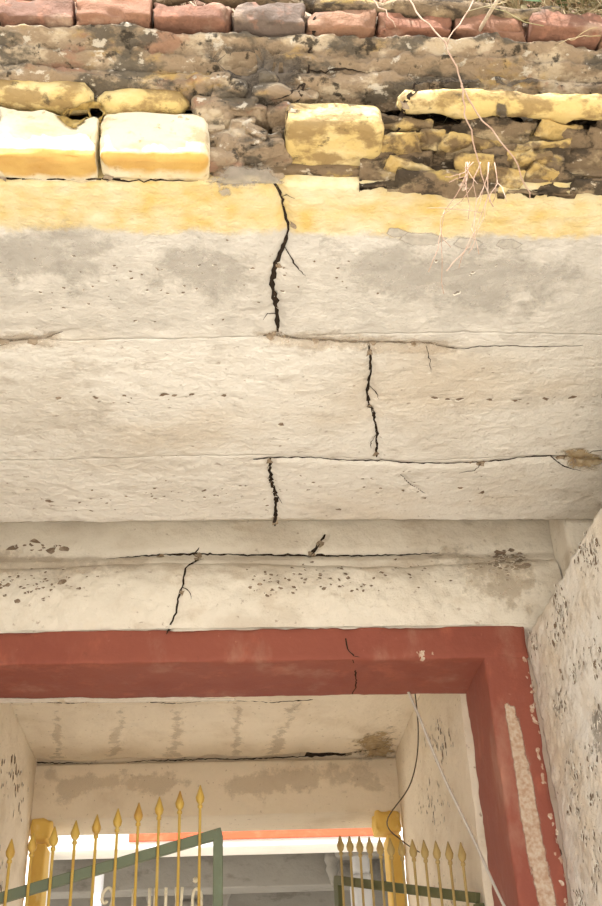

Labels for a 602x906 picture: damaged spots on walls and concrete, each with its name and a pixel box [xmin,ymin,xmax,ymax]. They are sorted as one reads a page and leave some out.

spalling [191,71,320,178]
crack [270,16,365,144]
crack [395,83,435,132]
spalling [359,113,602,199]
crack [253,168,602,526]
crack [108,534,437,634]
crack [345,638,358,694]
peeling [523,631,541,734]
crack [128,738,388,763]
flaking render [505,703,586,906]
peeling [563,704,602,895]